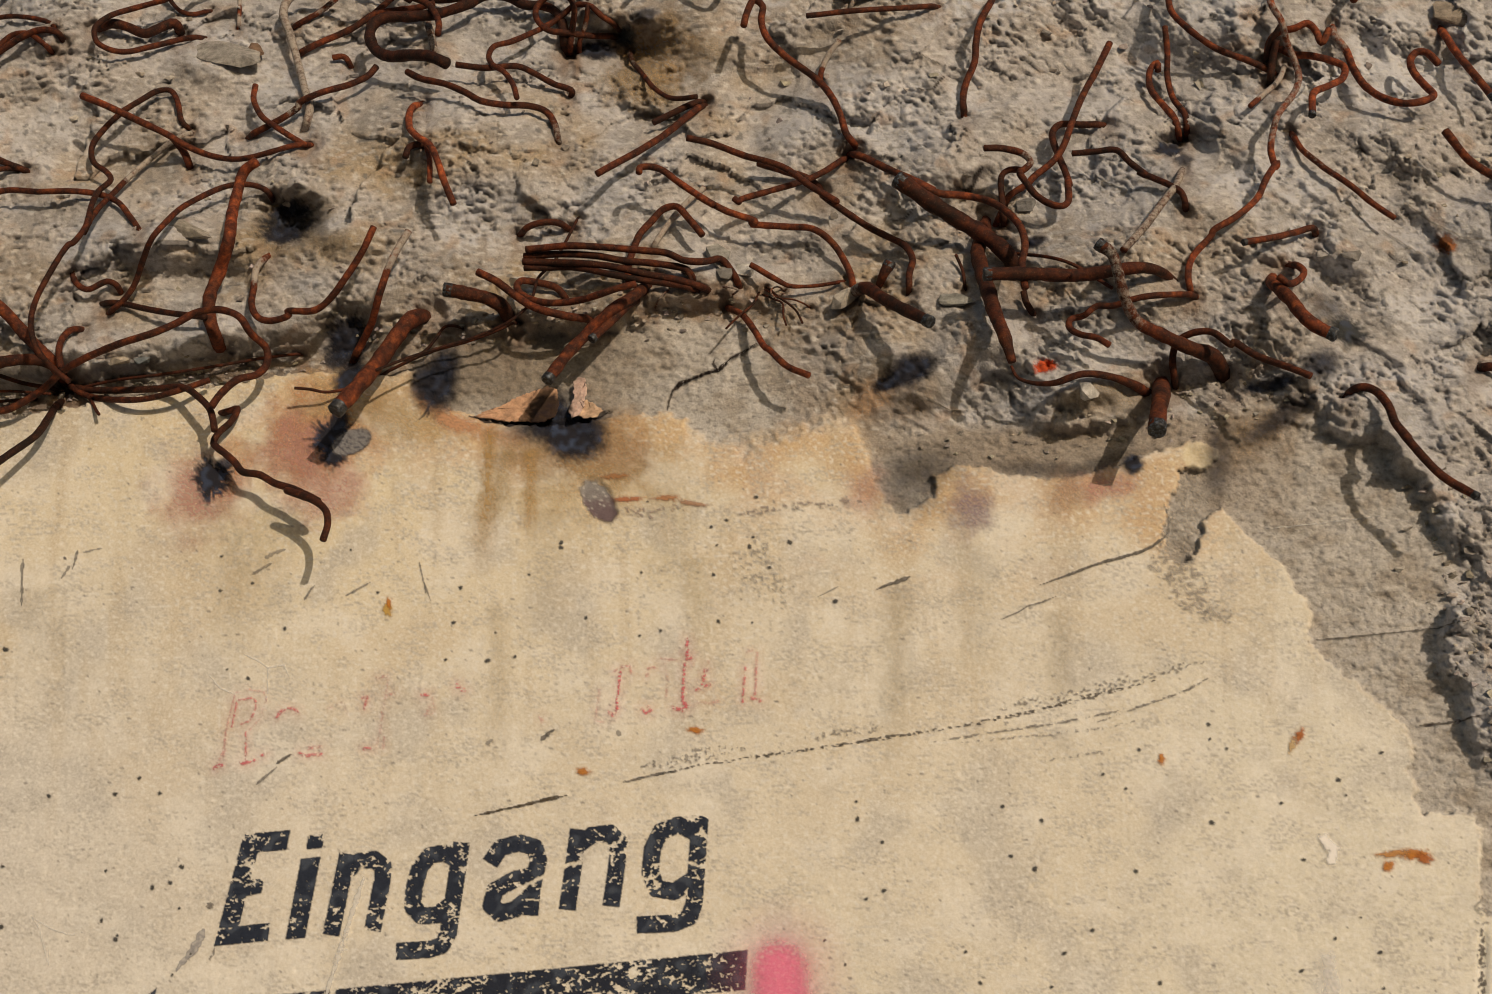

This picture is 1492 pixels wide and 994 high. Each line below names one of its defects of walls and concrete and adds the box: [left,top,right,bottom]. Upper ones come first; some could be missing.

spalling [0,0,303,365]
rust [1434,234,1457,255]
spalling [0,313,264,419]
rust [1034,359,1056,373]
water stain [274,382,370,478]
water stain [509,430,641,483]
rust [615,495,705,506]
spalling [215,0,1492,916]